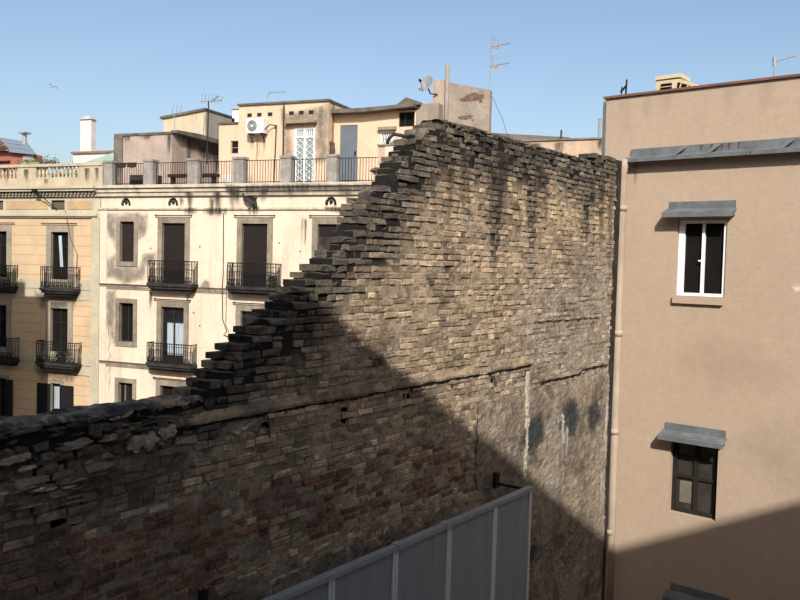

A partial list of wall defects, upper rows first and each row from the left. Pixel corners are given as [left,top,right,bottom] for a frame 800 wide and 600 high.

spalling [460,92,485,102]
leakage [206,184,367,213]
crack [534,297,604,354]
crack [541,364,608,384]
crack [177,364,531,438]